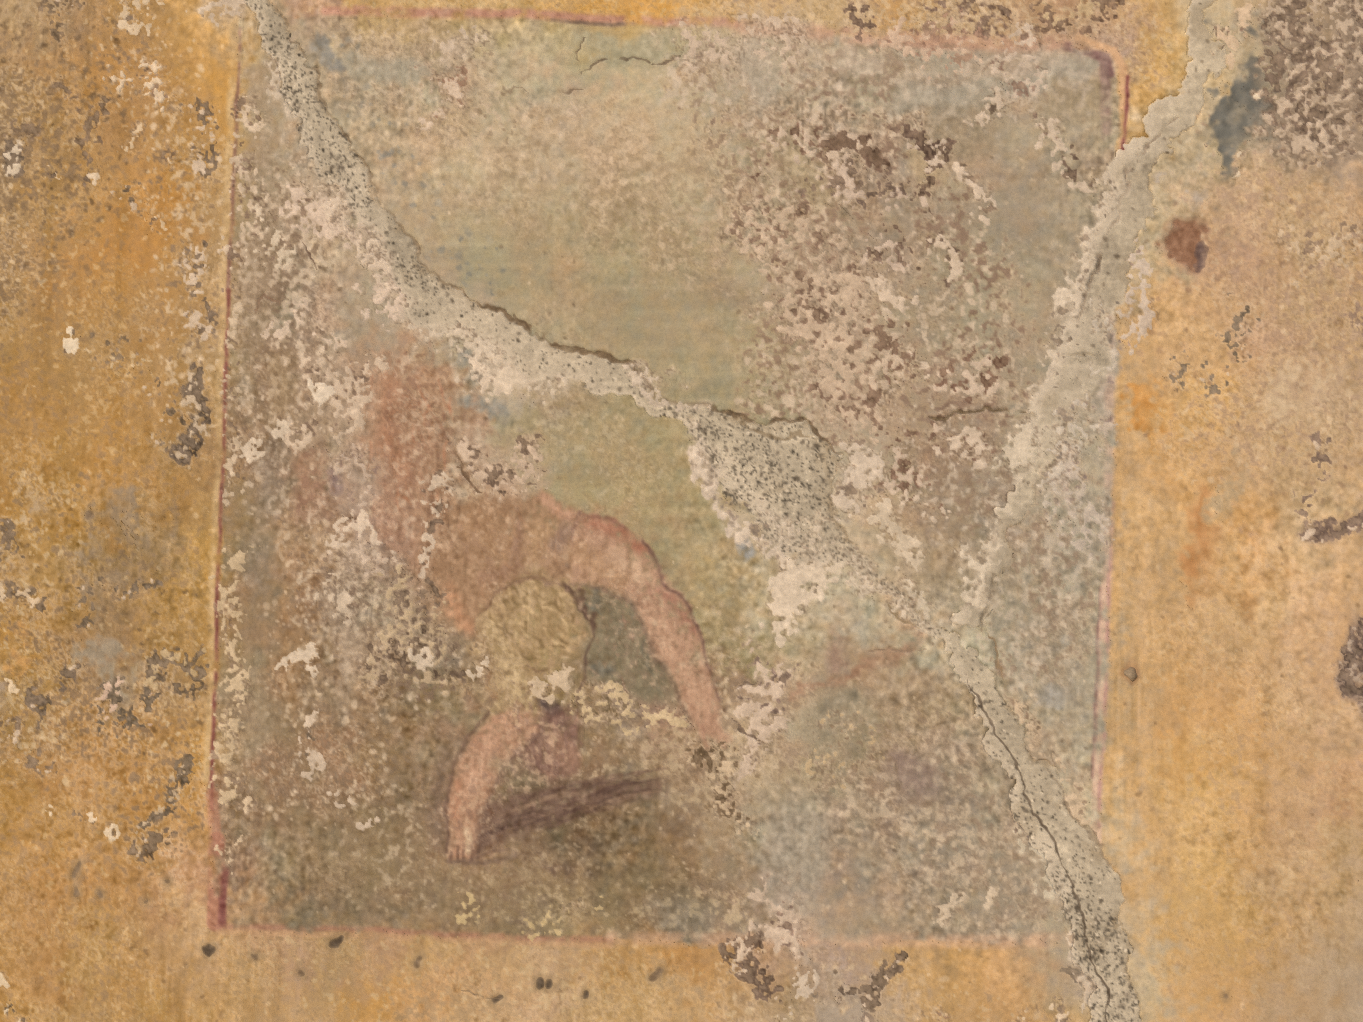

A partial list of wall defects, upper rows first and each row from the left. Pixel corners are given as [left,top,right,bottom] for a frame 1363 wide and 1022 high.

peeling [0,0,588,706]
crack [244,0,844,520]
peeling [524,0,1275,875]
crack [1077,0,1227,356]
spalling [1207,0,1363,196]
spalling [1264,206,1363,294]
spalling [1288,427,1363,551]
peeling [0,537,326,892]
crack [731,680,768,747]
crack [869,404,1143,1022]
spalling [1331,608,1363,736]
peeling [716,866,911,1022]